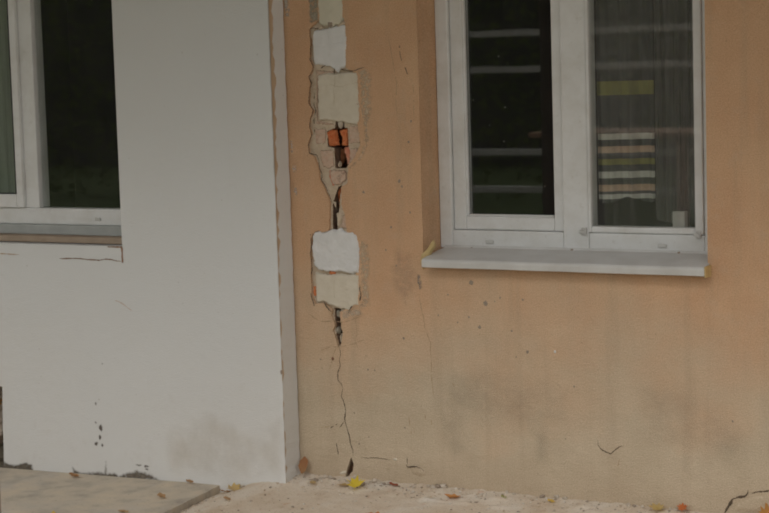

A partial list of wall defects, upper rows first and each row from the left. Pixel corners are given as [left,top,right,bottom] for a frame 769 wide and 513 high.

crack [308,27,364,202]
flaking render [309,22,370,231]
crack [59,256,120,264]
flaking render [312,242,368,346]
crack [311,287,397,461]
crack [724,490,769,513]